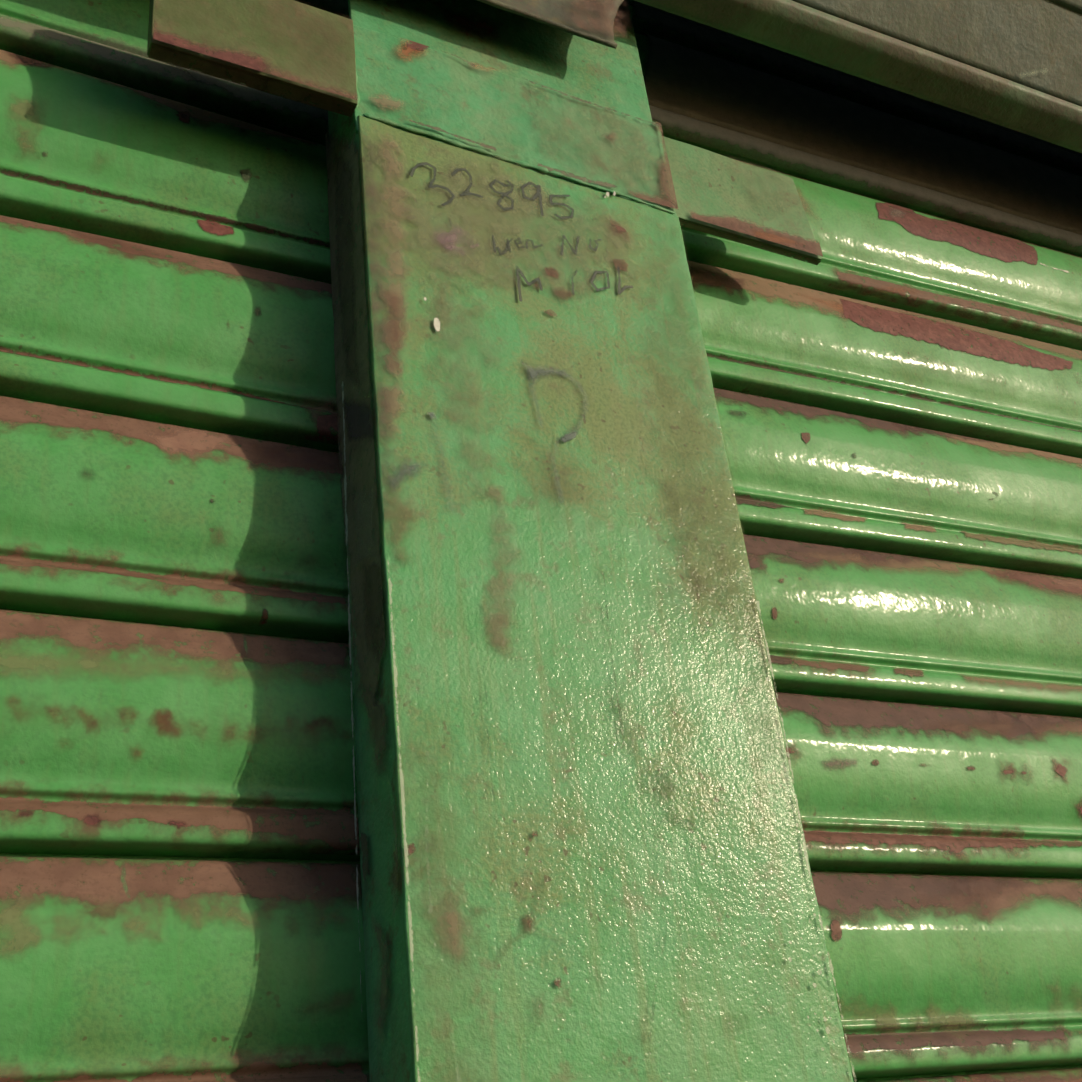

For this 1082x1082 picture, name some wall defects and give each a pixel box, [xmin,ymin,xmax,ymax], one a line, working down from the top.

peeling [197,219,234,236]
peeling [876,203,1069,273]
peeling [840,299,1082,371]